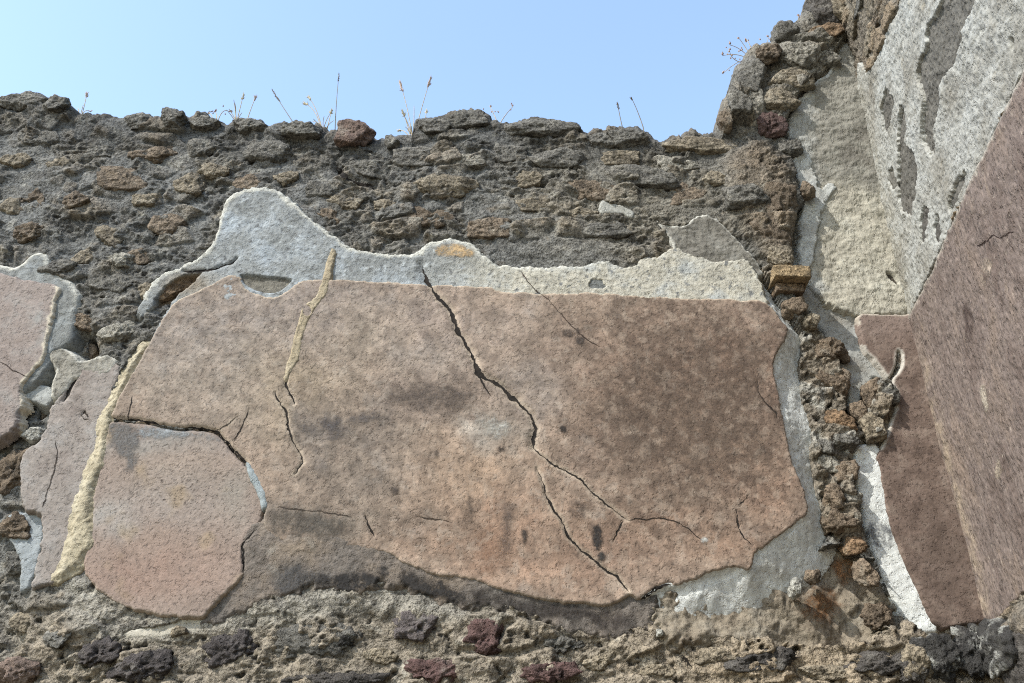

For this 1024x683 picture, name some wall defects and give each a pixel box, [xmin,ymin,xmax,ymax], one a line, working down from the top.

spalling [920,0,975,153]
spalling [883,89,941,243]
spalling [951,174,967,208]
spalling [242,276,291,293]
spalling [589,279,606,289]
crack [113,397,248,463]
crack [275,382,303,474]
crack [422,269,700,599]
crack [241,530,255,571]
crack [283,507,374,536]